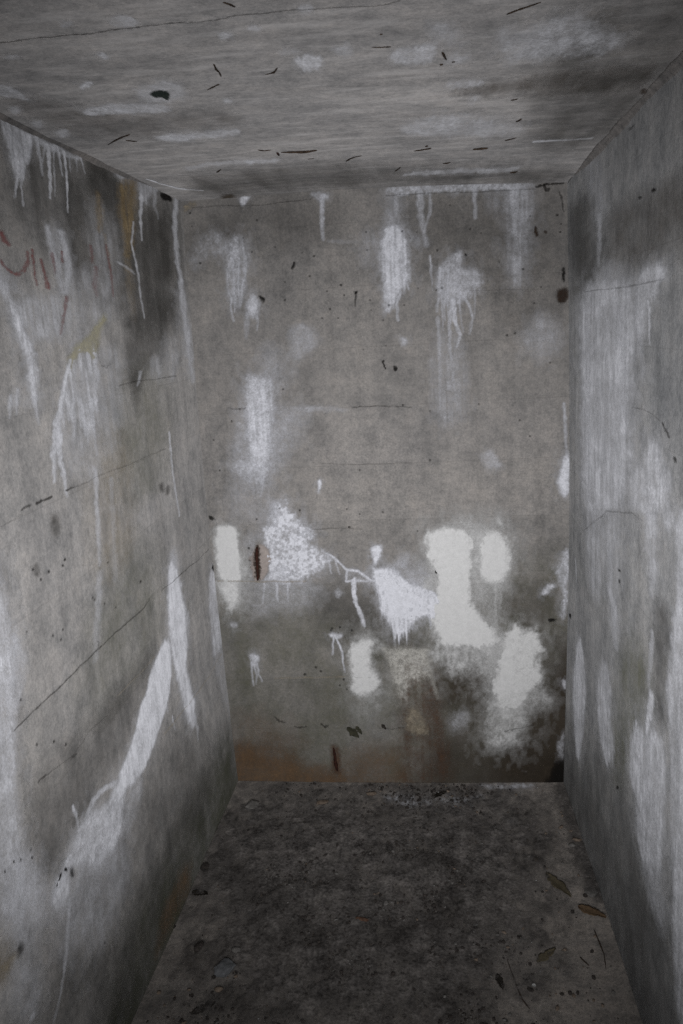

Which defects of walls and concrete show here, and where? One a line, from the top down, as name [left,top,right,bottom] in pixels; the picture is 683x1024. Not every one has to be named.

efflorescence [0,280,58,405]
leakage [1,120,120,207]
leakage [51,316,106,492]
leakage [131,179,190,345]
efflorescence [379,224,410,312]
efflorescence [387,172,528,237]
efflorescence [579,264,683,543]
efflorescence [209,525,247,655]
leakage [263,499,613,783]
efflorescence [53,560,195,913]
corrosion [332,746,340,773]
efflorescence [630,588,683,1014]